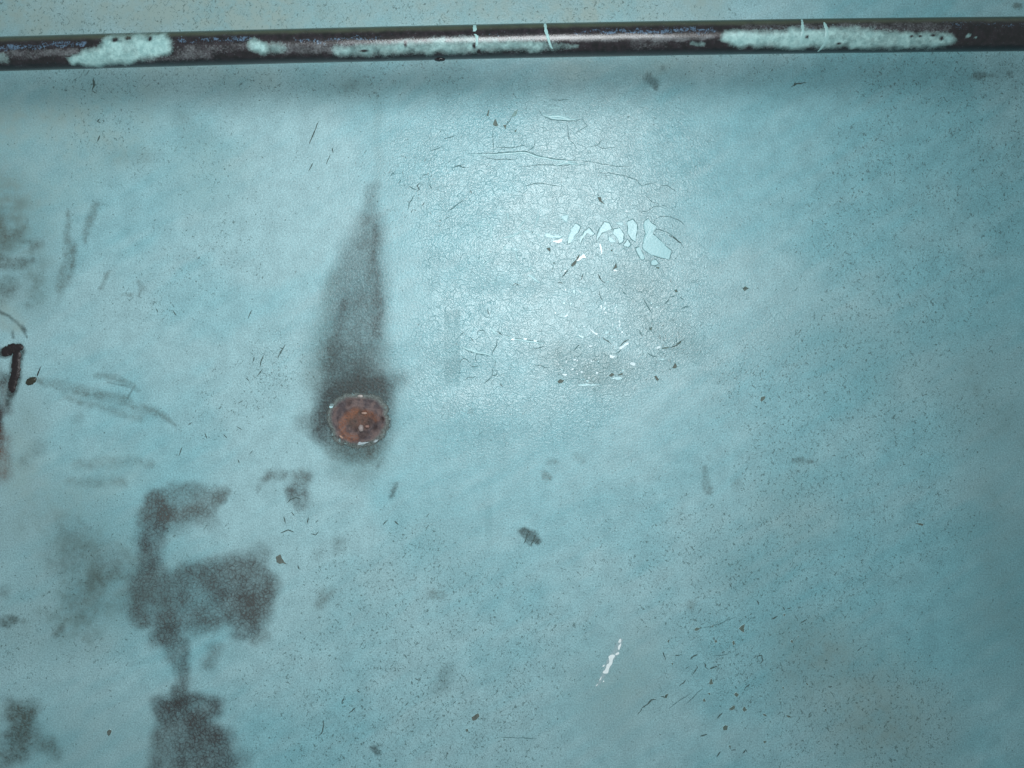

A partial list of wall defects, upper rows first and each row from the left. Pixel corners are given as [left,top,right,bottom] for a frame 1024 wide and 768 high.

crack [390,99,684,248]
leakage [313,224,390,459]
crack [460,309,548,386]
peeling [471,210,672,386]
peeling [639,289,689,369]
corrosion [326,393,391,448]
peeling [596,639,621,686]